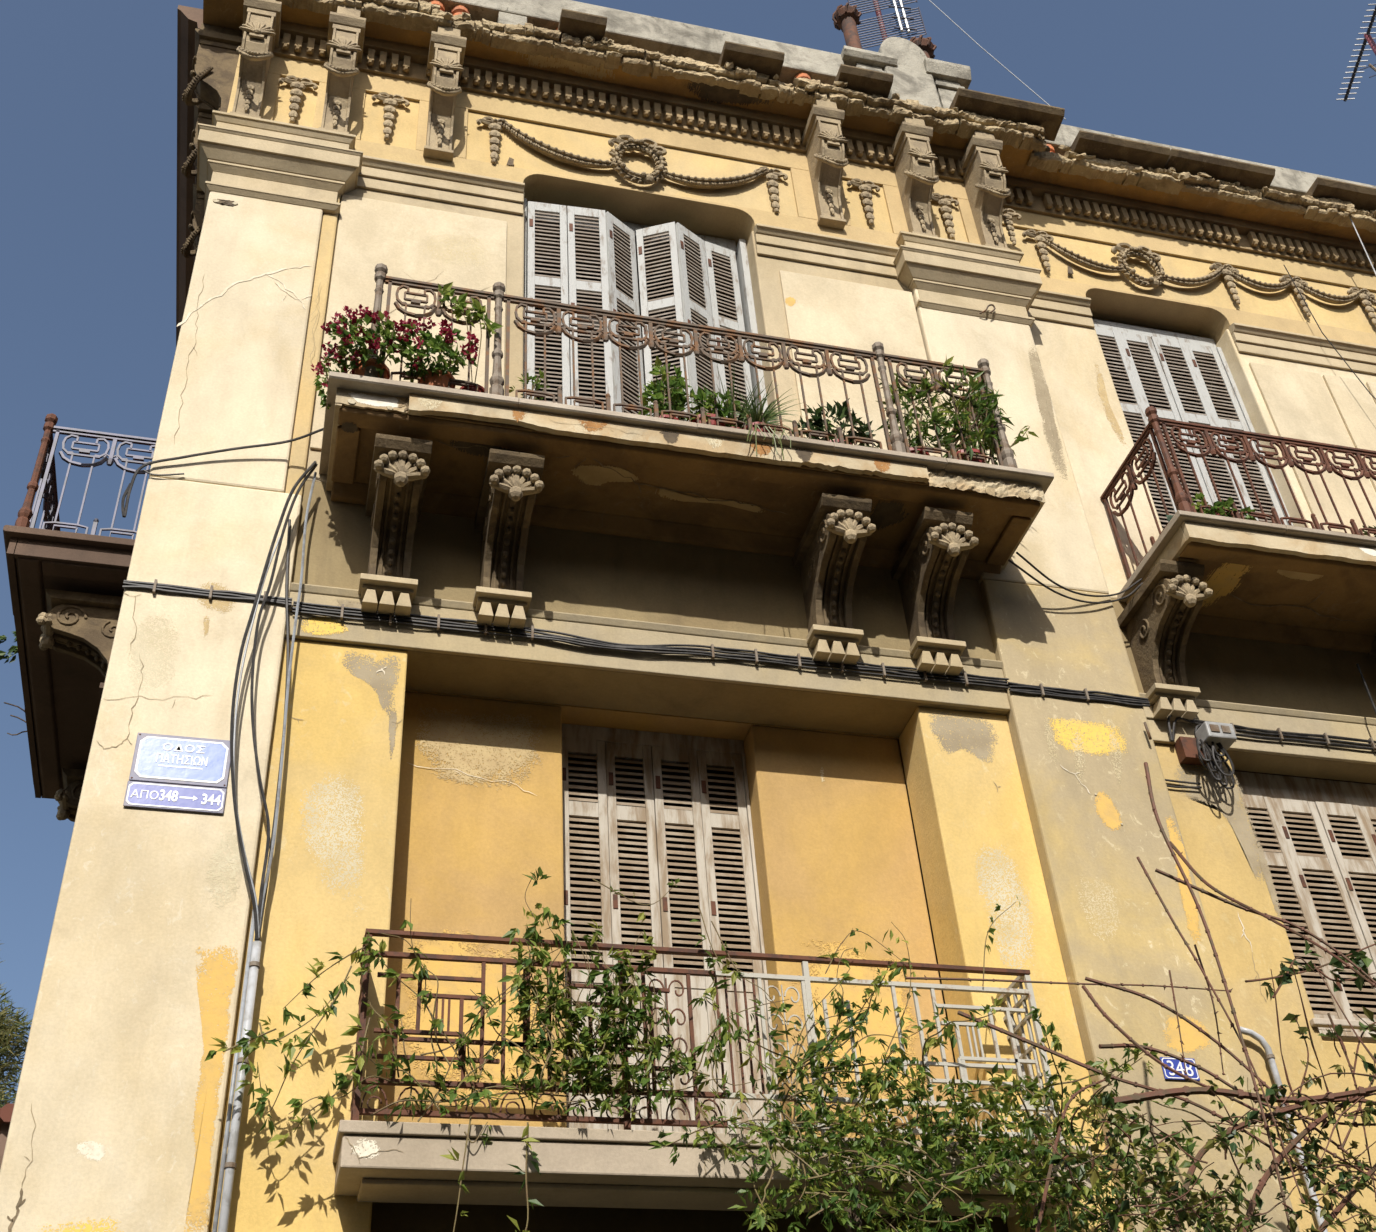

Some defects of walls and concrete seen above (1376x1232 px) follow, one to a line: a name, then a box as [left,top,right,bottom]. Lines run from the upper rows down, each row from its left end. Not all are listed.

flaking render [277,0,1376,232]
crack [174,265,320,441]
crack [97,592,210,749]